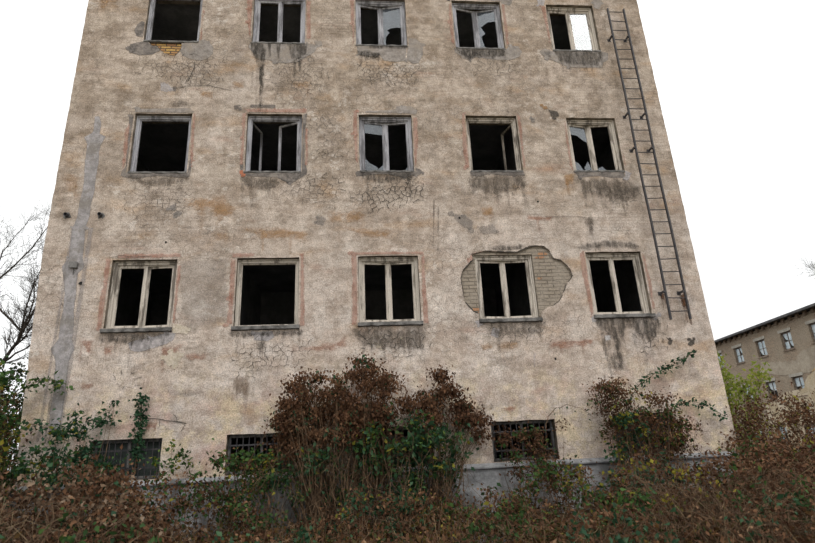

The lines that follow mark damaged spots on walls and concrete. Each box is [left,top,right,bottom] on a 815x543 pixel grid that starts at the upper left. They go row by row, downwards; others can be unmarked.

flaking render [150,43,182,56]
leakage [251,42,280,92]
crack [262,52,426,213]
flaking render [460,245,593,327]
crack [231,335,312,378]
leakage [354,328,422,348]
leakage [597,317,659,367]